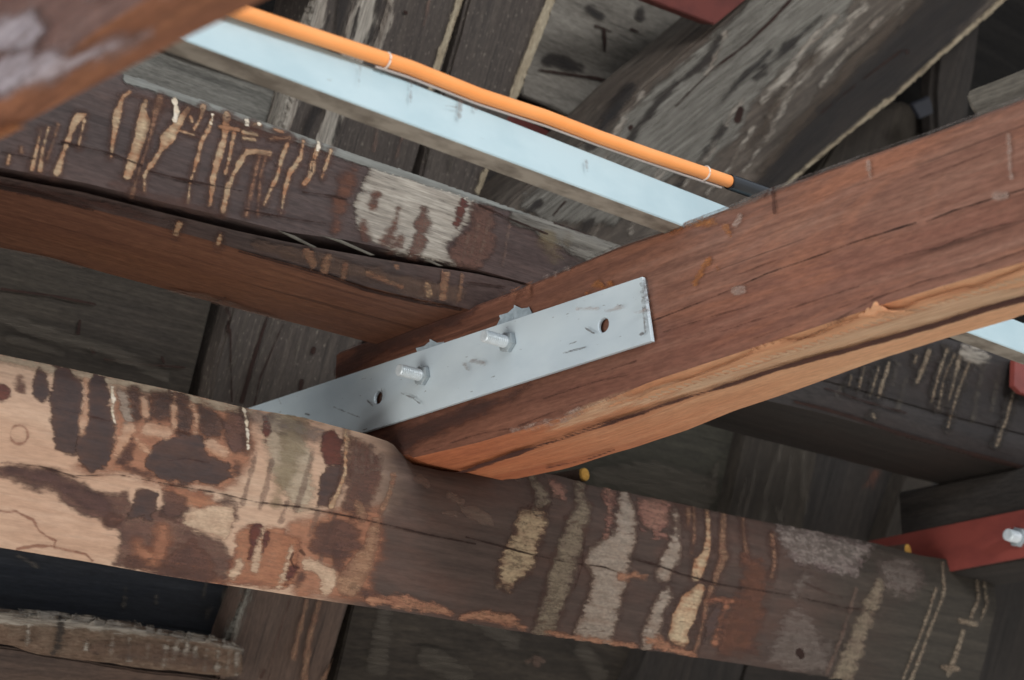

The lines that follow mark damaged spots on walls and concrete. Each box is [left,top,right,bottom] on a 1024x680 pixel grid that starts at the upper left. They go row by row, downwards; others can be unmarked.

crack [60,141,315,222]
crack [478,201,590,235]
crack [653,187,1024,338]
crack [457,251,1024,473]
crack [38,466,610,578]
crack [633,558,872,611]